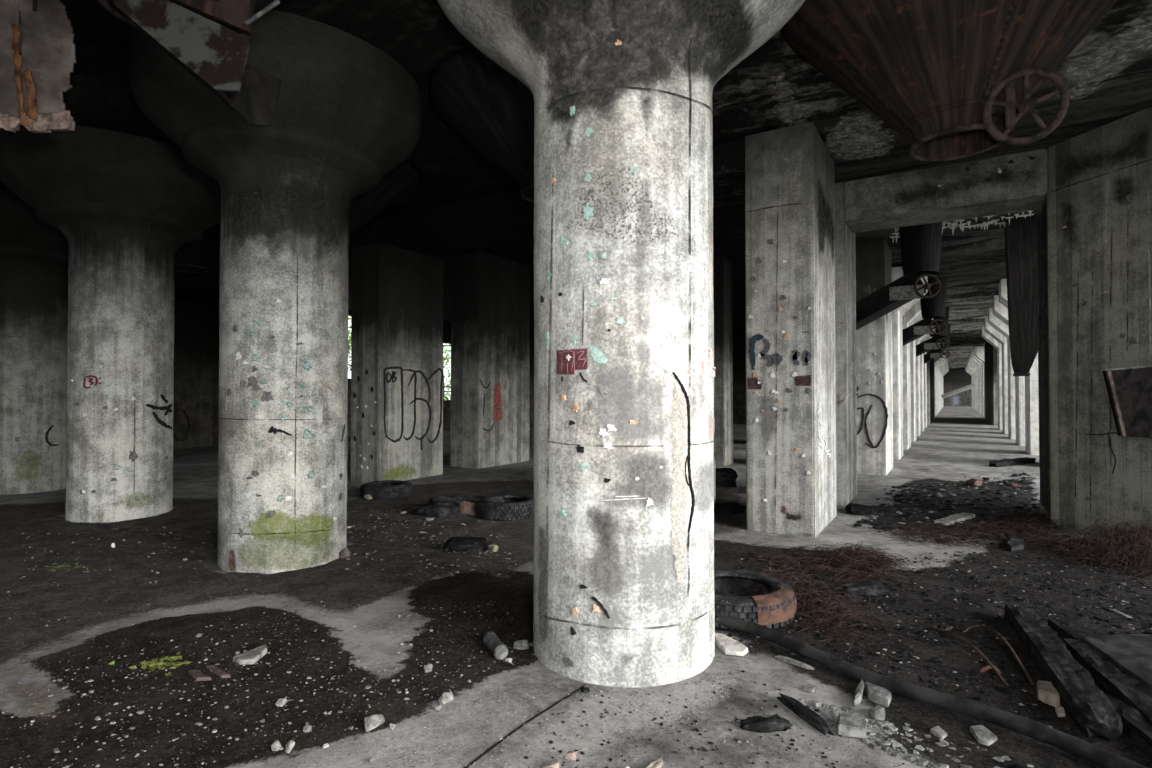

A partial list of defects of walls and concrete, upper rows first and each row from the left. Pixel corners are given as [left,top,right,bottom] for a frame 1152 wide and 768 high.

corrosion [0,0,77,133]